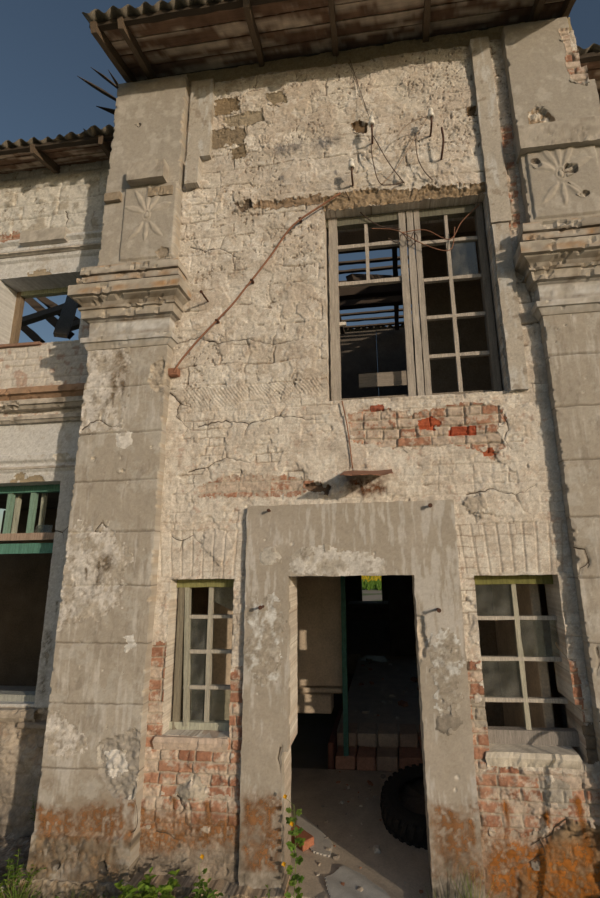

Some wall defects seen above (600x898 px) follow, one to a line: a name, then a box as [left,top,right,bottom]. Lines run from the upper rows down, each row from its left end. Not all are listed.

spalling [558,27,590,86]
peeling [212,88,288,160]
crack [170,393,316,433]
spalling [347,402,507,461]
corrosion [349,478,386,494]
spalling [15,592,288,833]